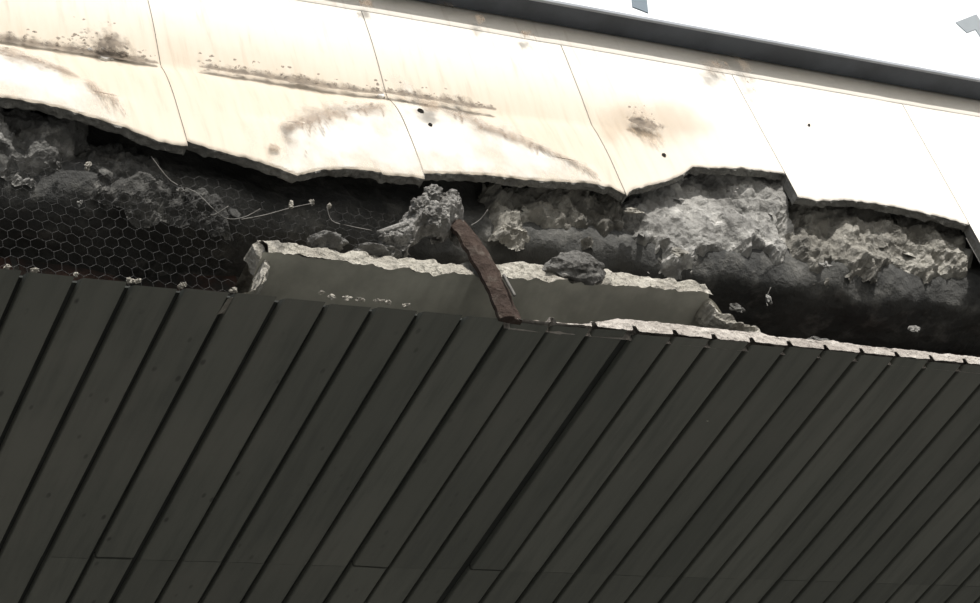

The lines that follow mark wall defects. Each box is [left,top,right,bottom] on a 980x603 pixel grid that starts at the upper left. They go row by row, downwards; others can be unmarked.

damp [0,19,158,64]
damp [199,52,496,118]
damp [628,106,663,130]
spalling [0,107,241,241]
spalling [477,174,973,288]